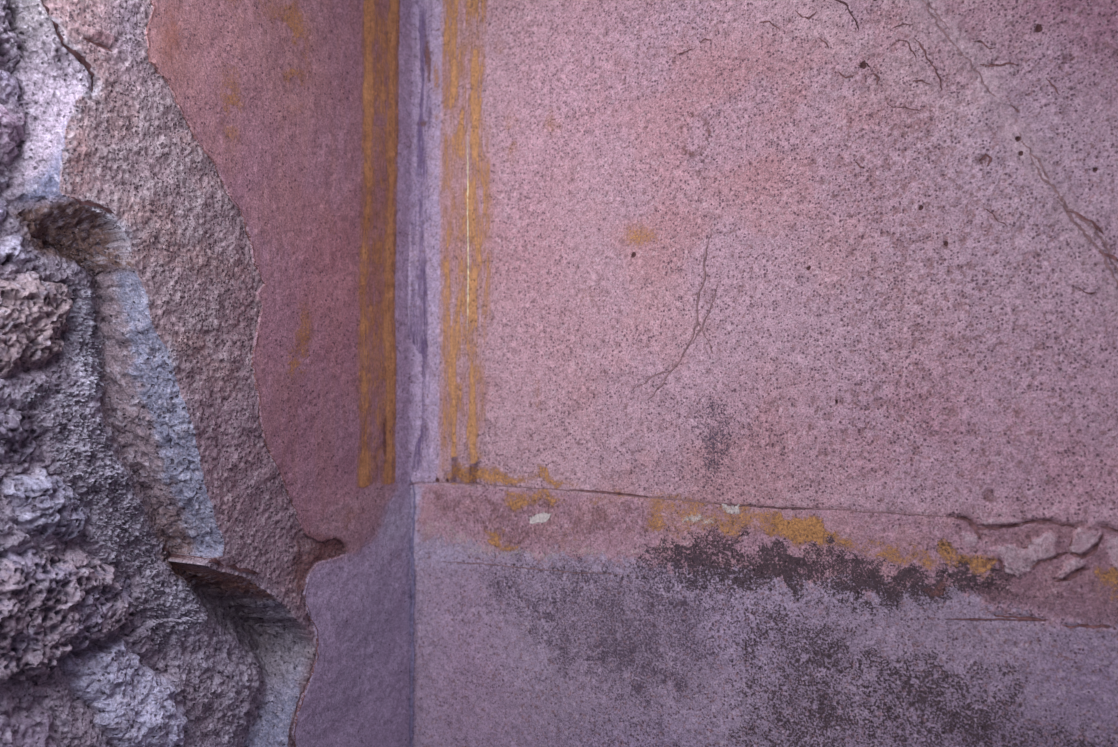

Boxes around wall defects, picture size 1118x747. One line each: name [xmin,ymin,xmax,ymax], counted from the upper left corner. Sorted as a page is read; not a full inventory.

crack [922,0,998,98]
crack [1019,133,1118,285]
spalling [0,0,346,747]
crack [409,478,1077,747]
leakage [470,493,1118,747]
peeling [954,516,1118,629]